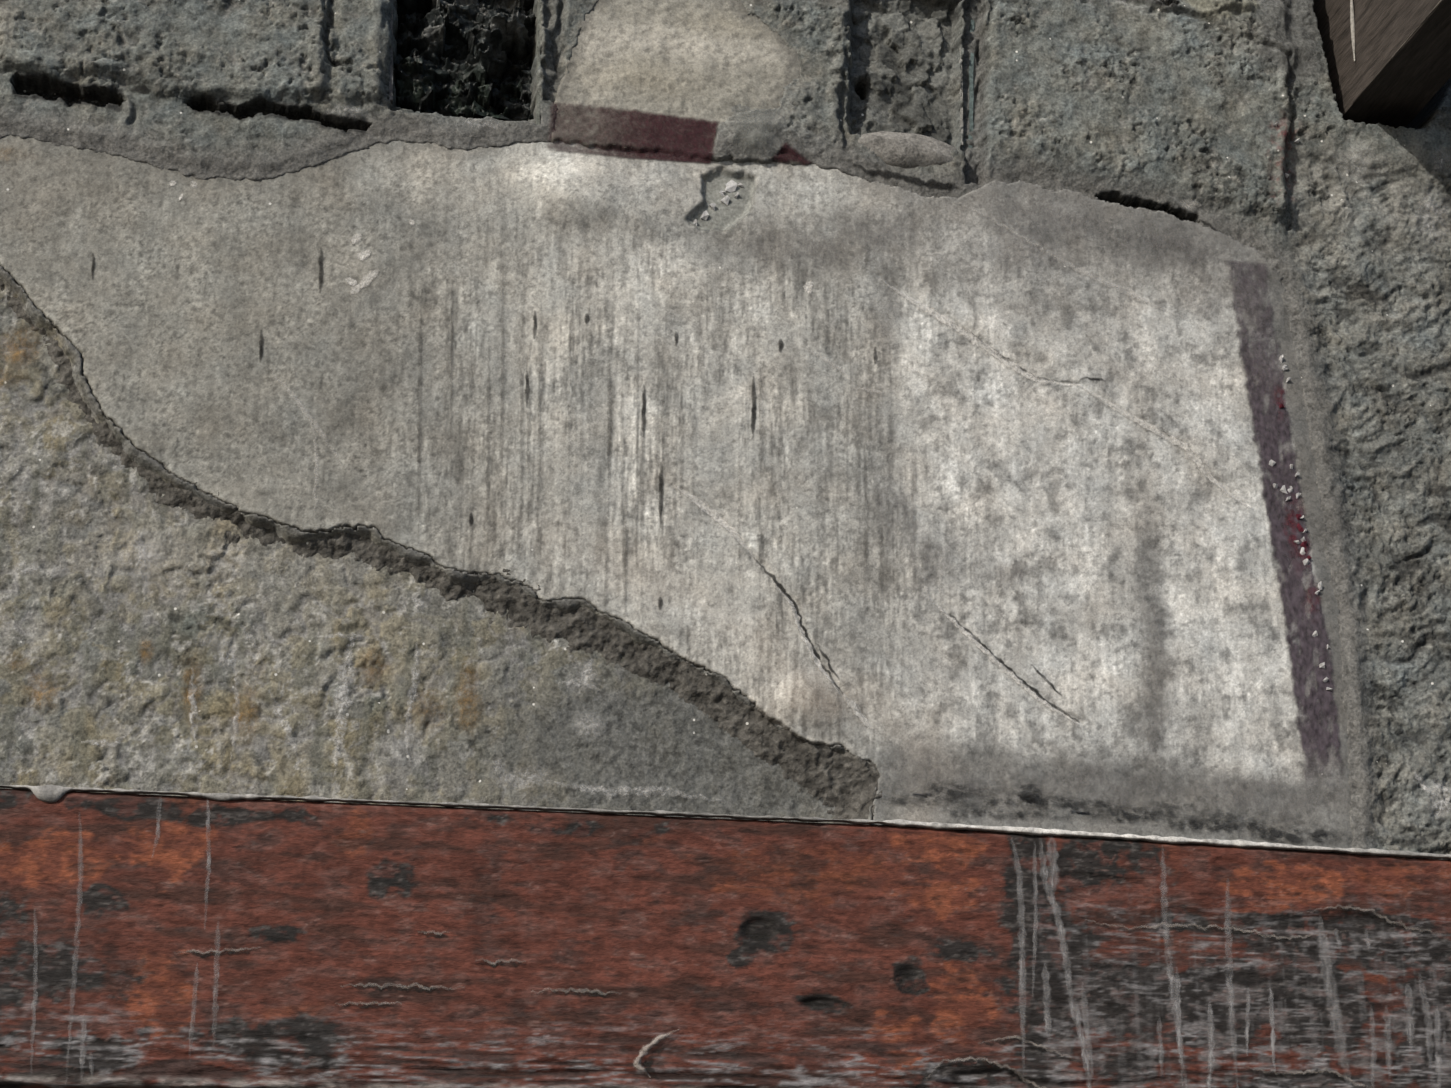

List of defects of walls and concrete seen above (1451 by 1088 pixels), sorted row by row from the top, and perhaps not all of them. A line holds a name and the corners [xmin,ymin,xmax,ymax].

spalling [687,171,755,231]
crack [900,293,1232,496]
spalling [0,266,882,825]
crack [679,489,871,728]
crack [938,607,1075,719]